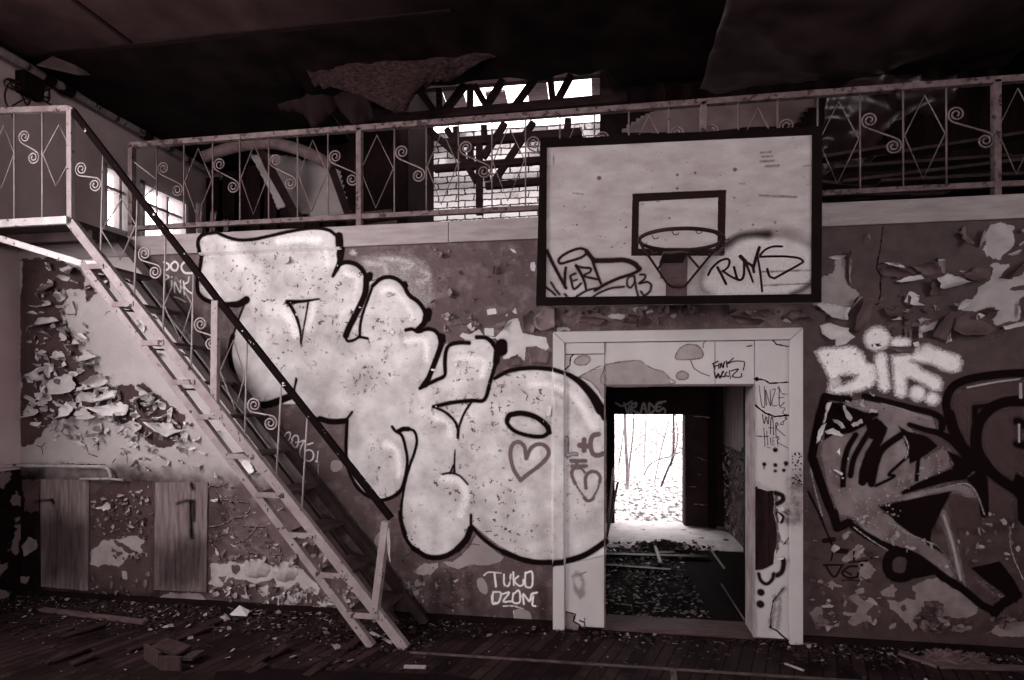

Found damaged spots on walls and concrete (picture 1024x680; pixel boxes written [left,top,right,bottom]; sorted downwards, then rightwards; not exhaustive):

spalling [438,222,1024,367]
peeling [19,257,207,596]
peeling [816,392,878,460]
peeling [241,460,255,480]
spalling [160,538,360,608]
spalling [809,455,979,634]
peeling [957,512,1021,563]
spalling [990,609,1024,638]